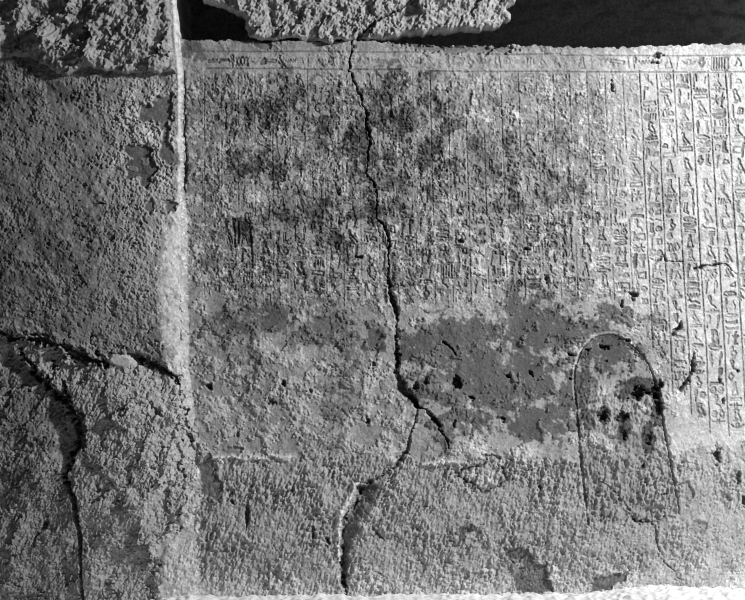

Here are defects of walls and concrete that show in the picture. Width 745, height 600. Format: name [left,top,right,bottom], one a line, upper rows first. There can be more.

crack [0,328,110,600]
crack [126,349,196,453]
crack [337,2,451,596]
damp [190,265,671,458]